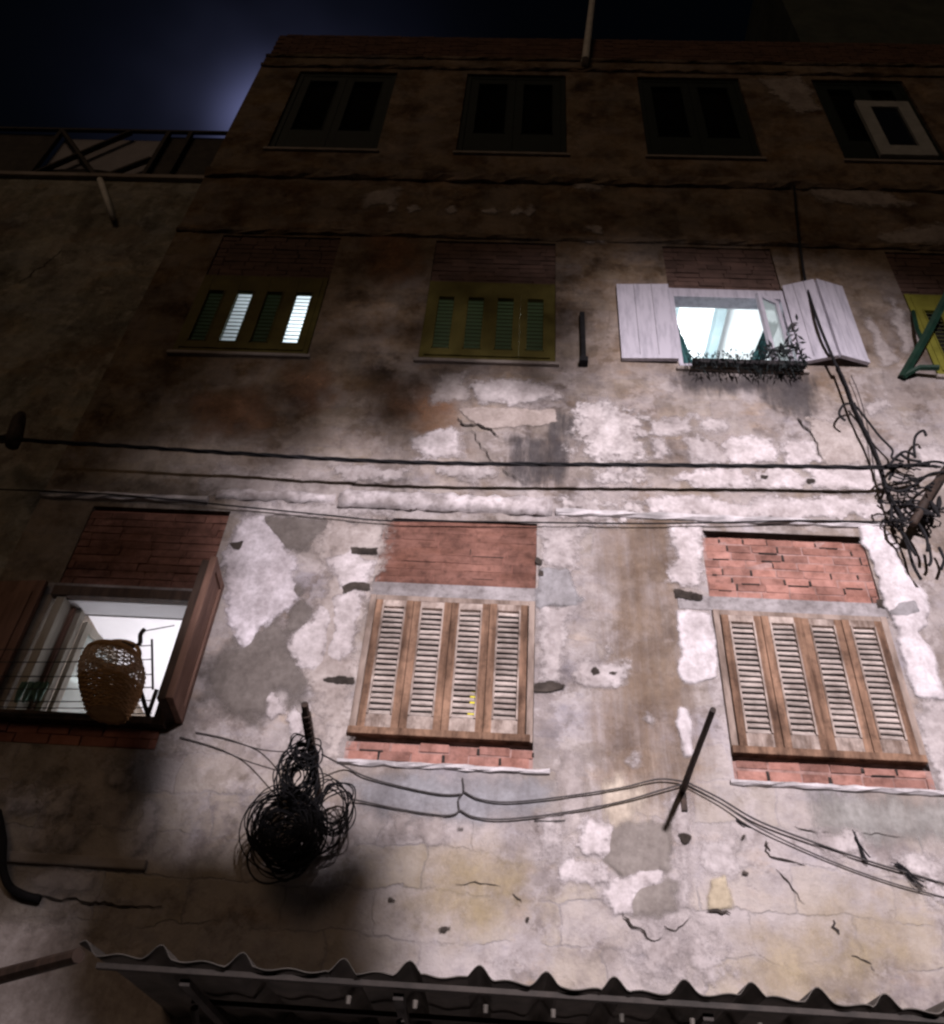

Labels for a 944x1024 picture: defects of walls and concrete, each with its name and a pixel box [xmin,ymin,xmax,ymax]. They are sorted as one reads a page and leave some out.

peeling [429,370,562,429]
crack [458,418,524,483]
crack [797,417,826,462]
peeling [534,398,886,692]
peeling [199,426,496,769]
peeling [676,707,694,757]
peeling [527,814,663,914]
peeling [708,876,733,909]
crack [765,840,804,902]
crack [623,908,731,942]
peeling [625,910,737,985]